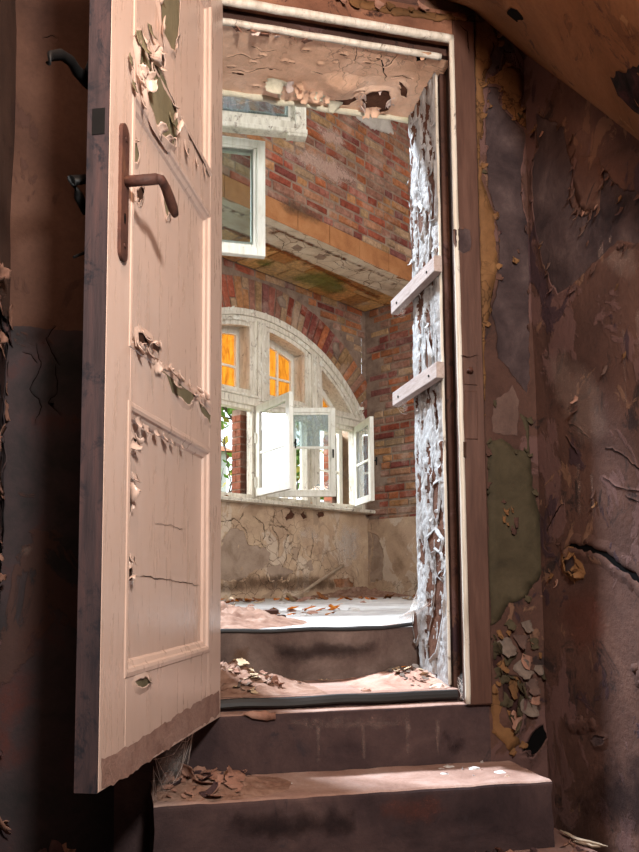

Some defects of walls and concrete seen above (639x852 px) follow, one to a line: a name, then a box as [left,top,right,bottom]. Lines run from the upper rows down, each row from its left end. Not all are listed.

peeling [233,25,312,53]
peeling [250,58,411,119]
crack [352,47,413,81]
peeling [0,263,13,586]
crack [225,511,315,568]
crack [546,503,639,598]